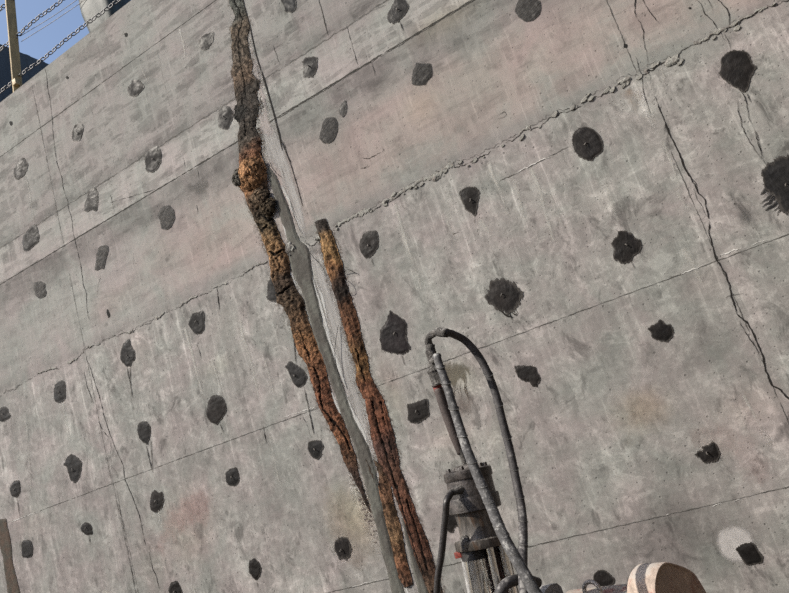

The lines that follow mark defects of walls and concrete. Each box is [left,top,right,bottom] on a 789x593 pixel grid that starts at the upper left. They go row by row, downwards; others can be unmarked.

rust [229,0,370,512]
rust [314,218,442,593]
crack [634,0,789,399]